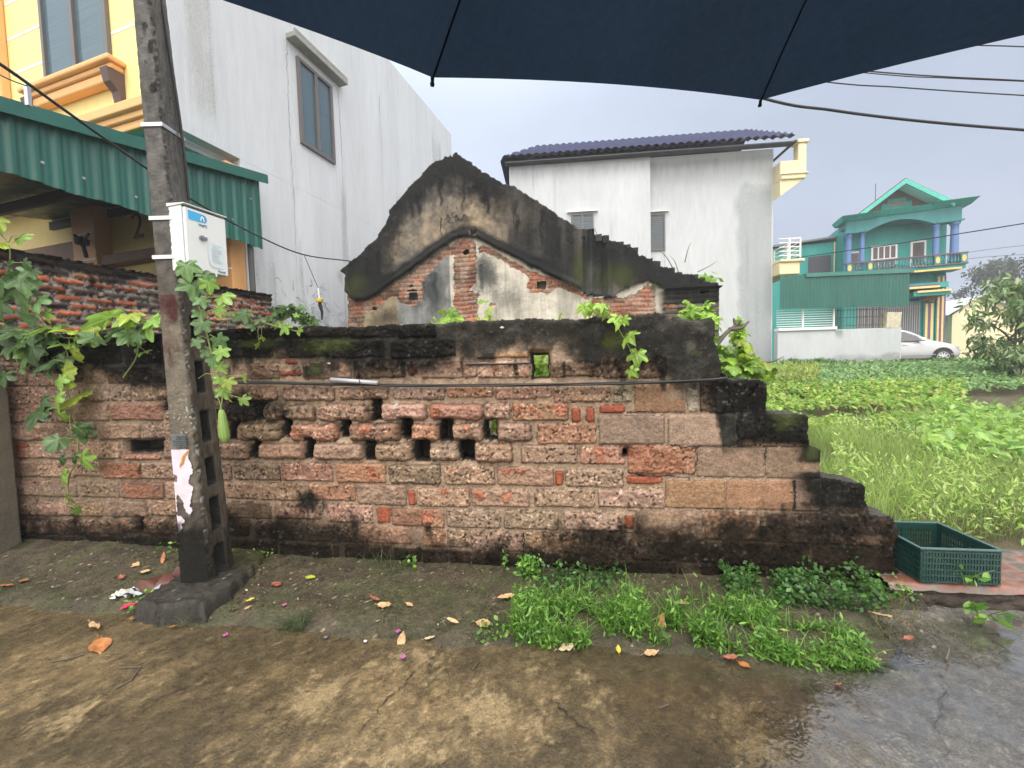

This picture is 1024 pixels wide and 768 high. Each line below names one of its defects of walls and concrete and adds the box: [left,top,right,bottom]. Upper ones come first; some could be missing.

water stain [340,152,723,305]
peeling [347,239,679,327]
water stain [28,332,167,389]
water stain [206,312,900,583]
water stain [19,508,208,584]